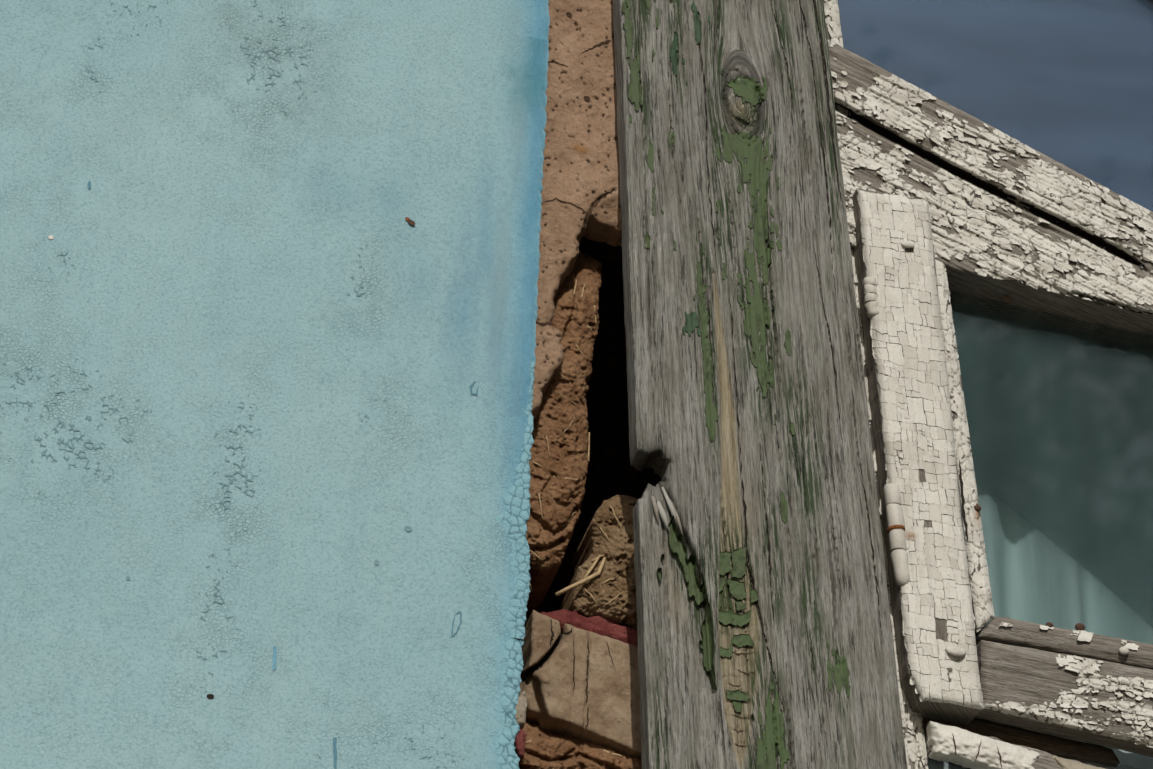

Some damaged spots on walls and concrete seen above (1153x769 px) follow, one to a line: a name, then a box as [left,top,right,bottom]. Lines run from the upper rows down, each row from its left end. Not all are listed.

peeling [691,0,711,45]
peeling [670,31,688,86]
peeling [903,115,986,166]
peeling [715,126,782,398]
peeling [953,189,997,237]
peeling [985,173,1031,227]
peeling [998,272,1053,289]
peeling [1101,202,1153,272]
peeling [682,245,719,443]
crack [771,0,1153,641]
peeling [1071,630,1094,642]
peeling [1055,655,1153,748]